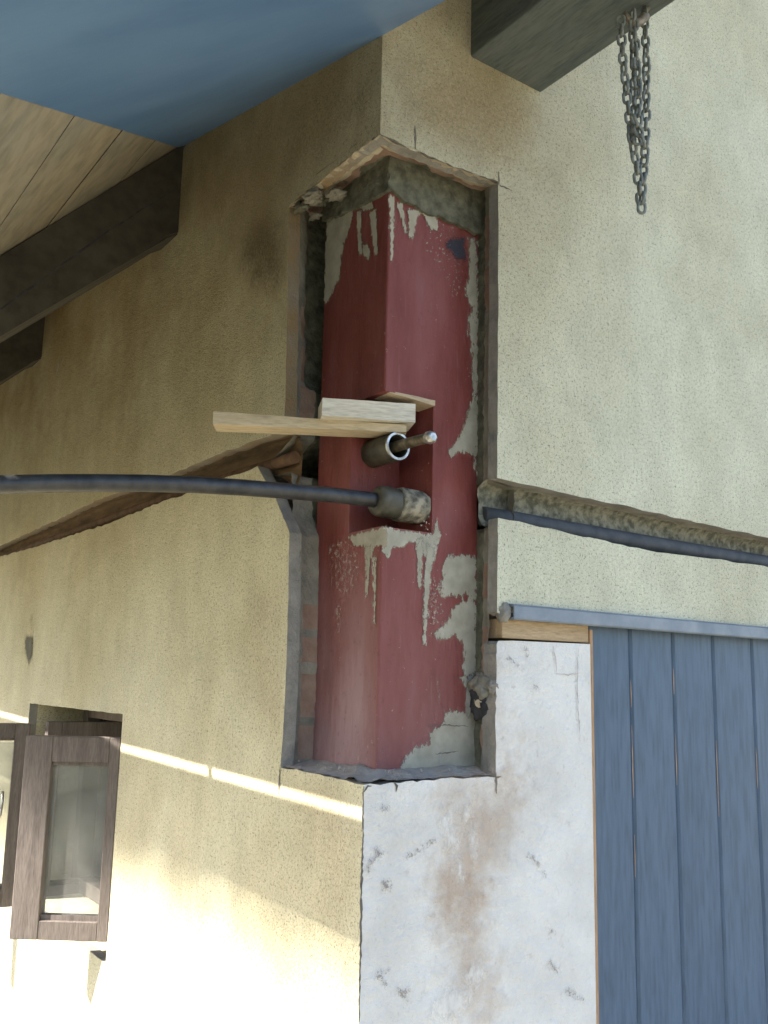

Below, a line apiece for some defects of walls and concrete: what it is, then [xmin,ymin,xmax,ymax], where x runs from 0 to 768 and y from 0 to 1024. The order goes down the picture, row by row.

peeling [293,187,355,304]
peeling [449,237,479,475]
peeling [400,554,499,769]